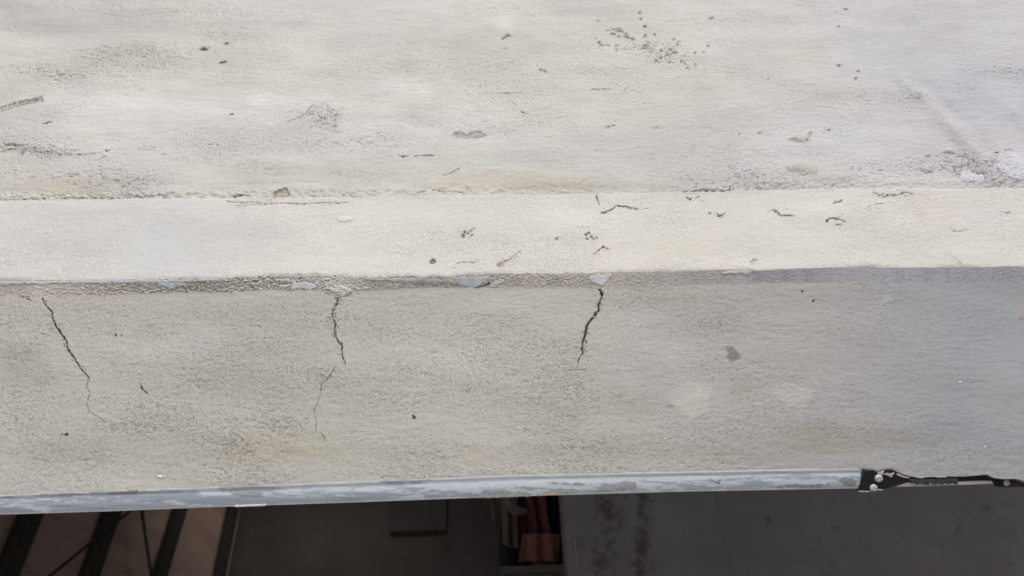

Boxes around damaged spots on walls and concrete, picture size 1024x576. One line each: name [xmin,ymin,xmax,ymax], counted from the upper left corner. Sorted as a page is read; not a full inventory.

crack [19,296,103,421]
crack [314,298,346,443]
crack [566,290,605,371]